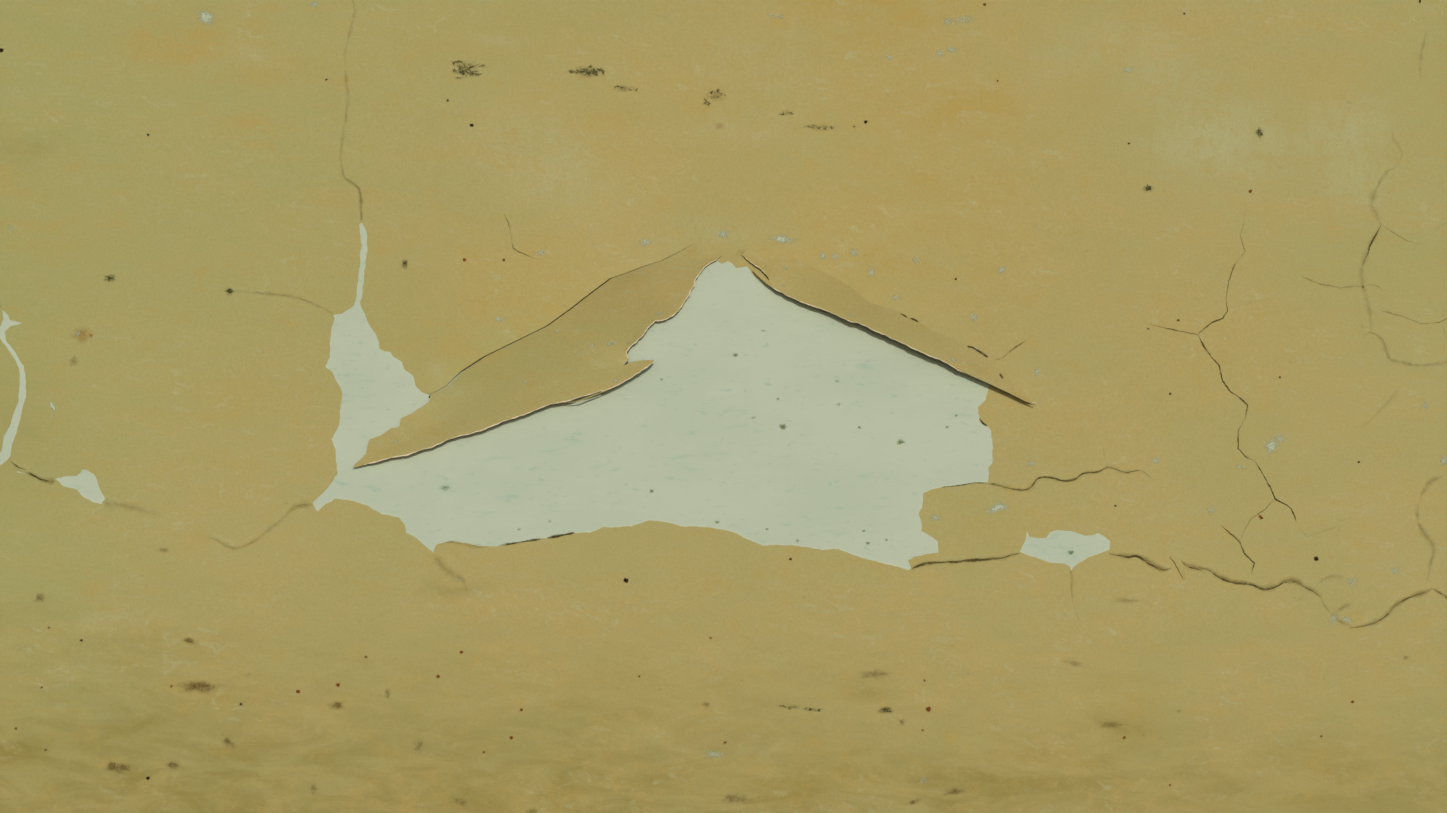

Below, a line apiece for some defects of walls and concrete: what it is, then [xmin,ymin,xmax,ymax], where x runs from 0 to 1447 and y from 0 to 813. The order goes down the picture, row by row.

peeling [0,310,26,473]
peeling [313,222,1037,570]
crack [1108,265,1447,631]
peeling [55,470,105,504]
crack [988,458,1156,492]
crack [908,544,1020,572]
peeling [1020,530,1110,571]